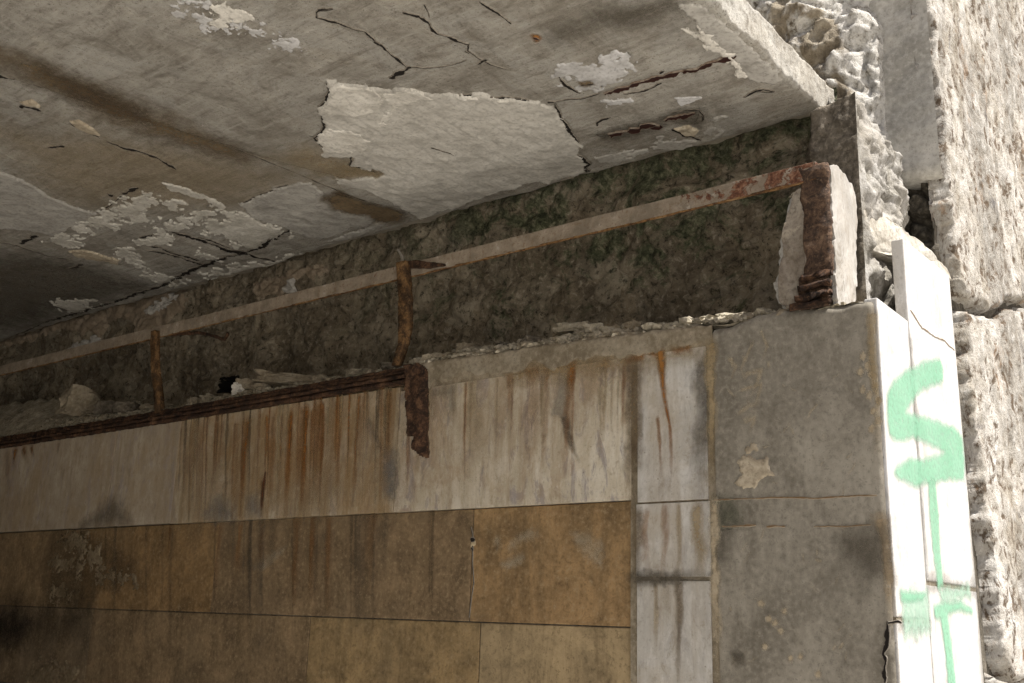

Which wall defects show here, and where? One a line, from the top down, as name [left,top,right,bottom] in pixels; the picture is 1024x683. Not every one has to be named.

peeling [170,0,307,53]
crack [315,4,507,79]
crack [479,1,512,24]
peeling [550,25,748,108]
crack [92,134,177,170]
peeling [317,129,371,154]
peeling [321,84,433,128]
rust [408,178,817,277]
peeling [0,182,330,355]
crack [910,310,955,351]
rust [627,347,688,448]
rust [184,381,392,506]